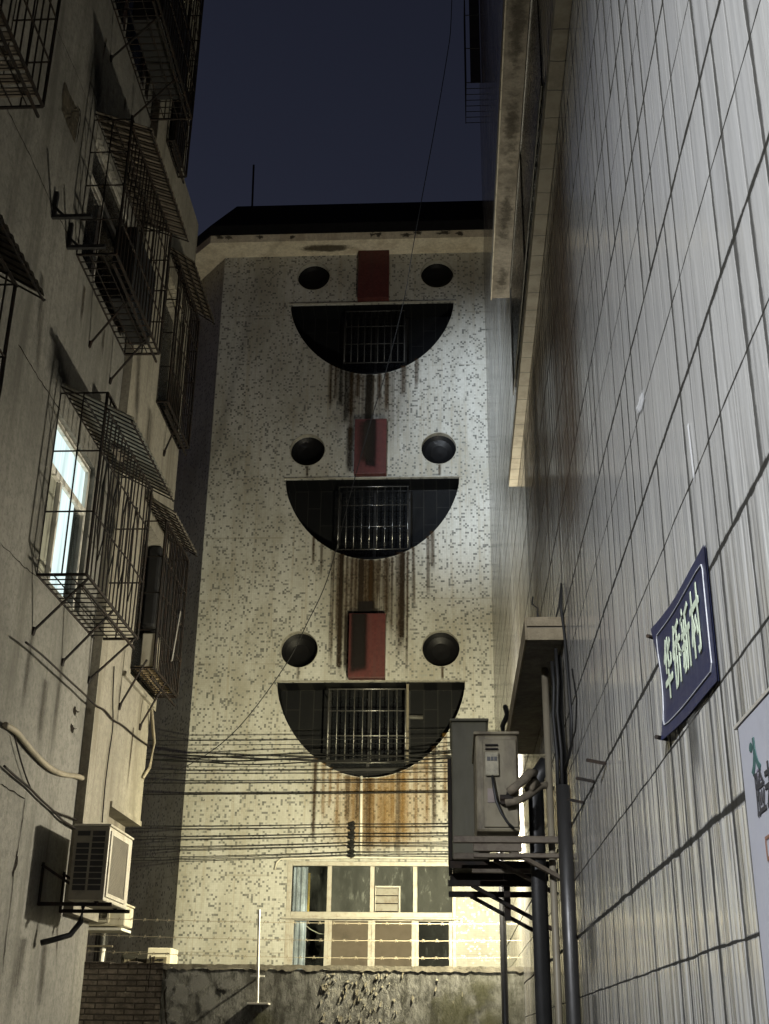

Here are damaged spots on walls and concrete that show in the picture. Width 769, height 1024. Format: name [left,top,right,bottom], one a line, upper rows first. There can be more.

rust [330,362,417,434]
rust [313,531,434,667]
rust [329,768,408,841]
rust [427,747,446,820]
peeling [321,973,397,1024]